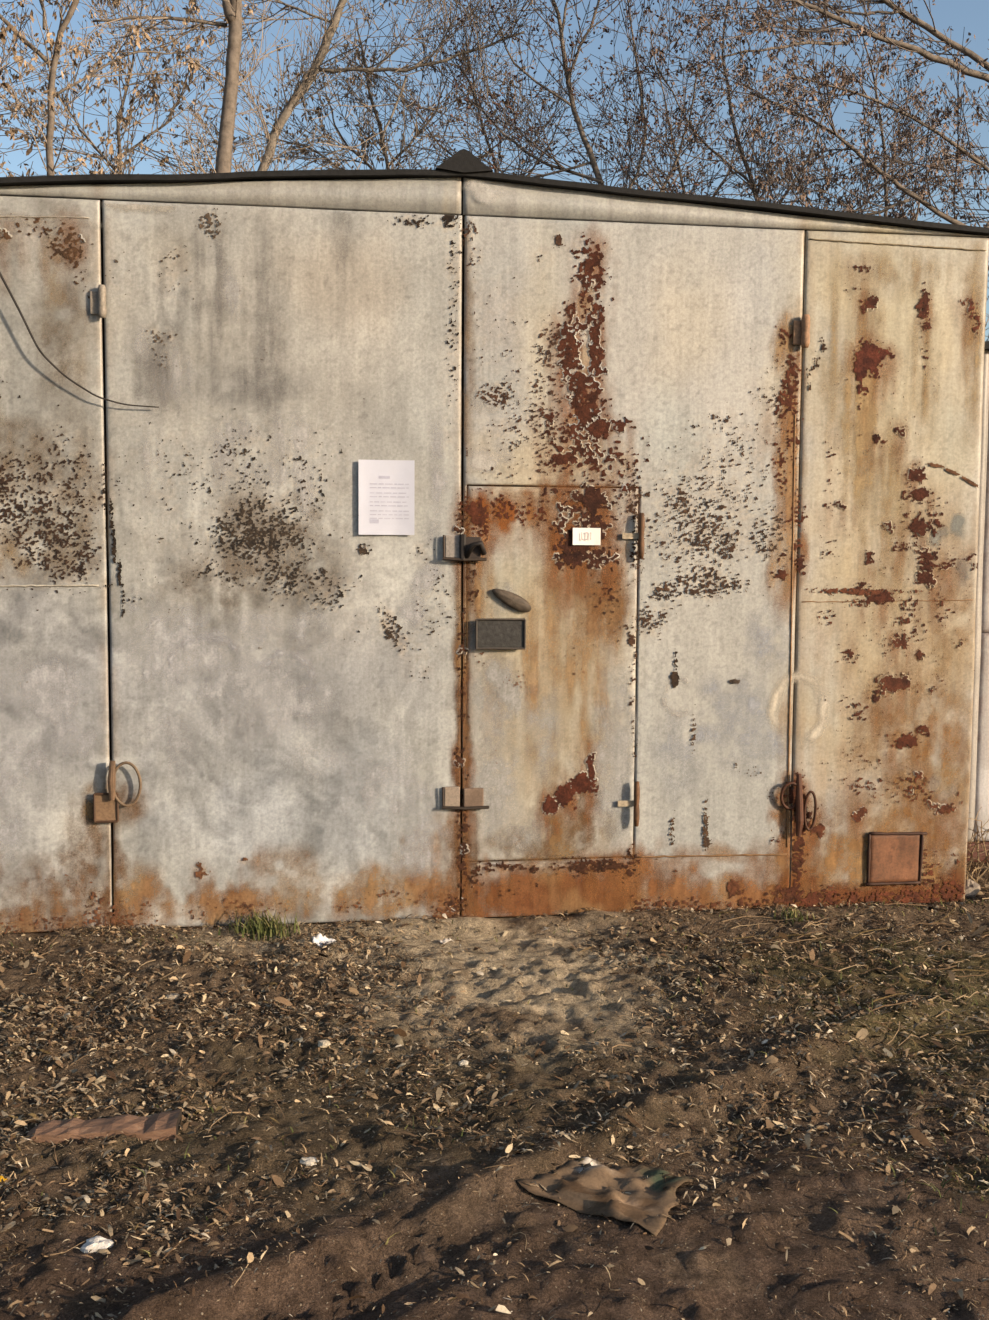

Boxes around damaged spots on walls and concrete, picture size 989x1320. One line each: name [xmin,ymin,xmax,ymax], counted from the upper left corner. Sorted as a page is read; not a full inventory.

corrosion [960,266,982,410]
leakage [221,495,315,584]
corrosion [0,208,978,934]